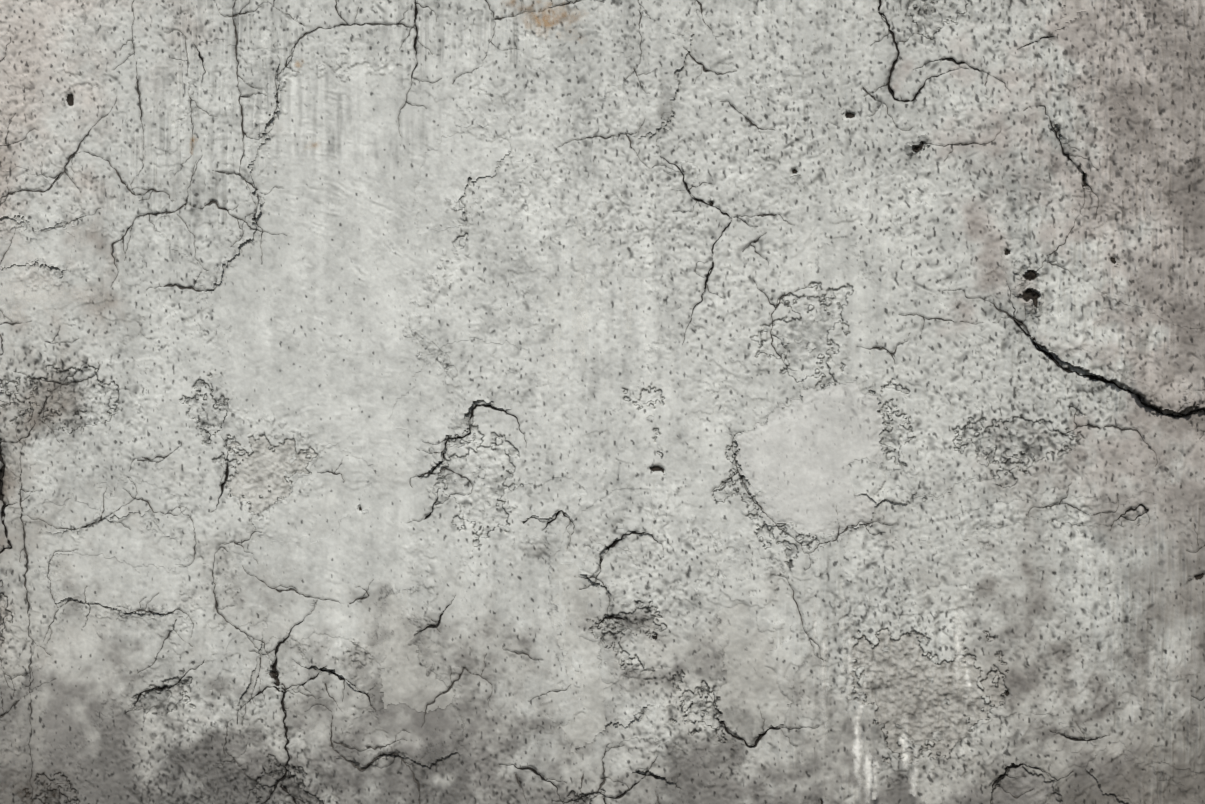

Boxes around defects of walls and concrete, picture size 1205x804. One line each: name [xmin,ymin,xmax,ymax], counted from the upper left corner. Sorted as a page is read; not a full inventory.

crack [0,0,602,291]
crack [686,49,774,130]
crack [556,119,812,371]
crack [860,0,1205,462]
spalling [0,365,119,433]
crack [0,310,541,804]
crack [522,511,664,629]
crack [712,431,888,667]
crack [503,743,681,804]
crack [707,693,819,748]
crack [990,747,1073,803]
crack [1051,723,1108,742]